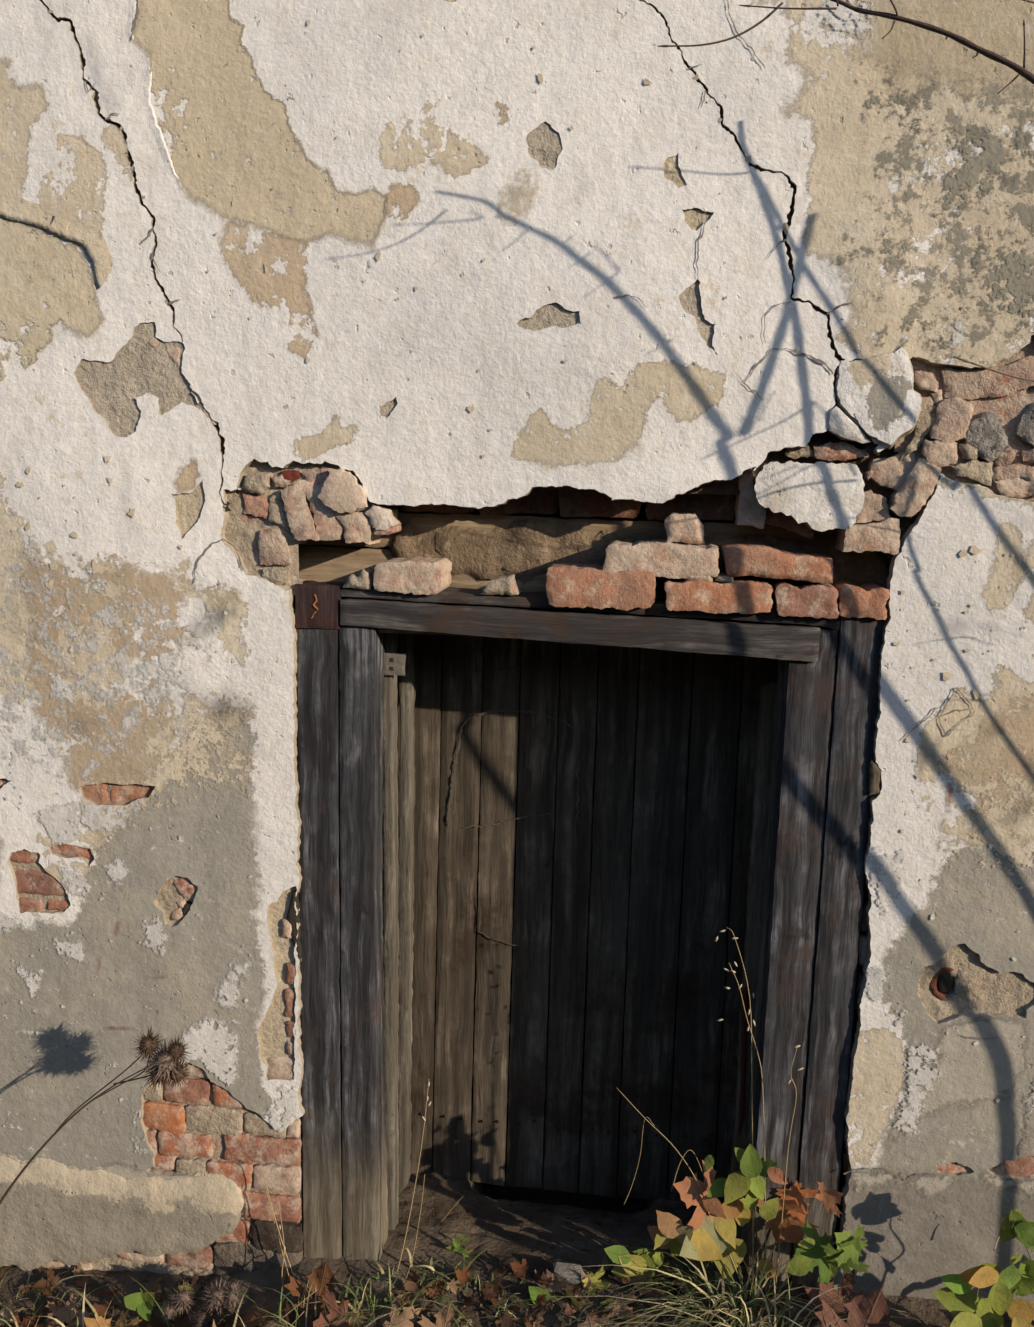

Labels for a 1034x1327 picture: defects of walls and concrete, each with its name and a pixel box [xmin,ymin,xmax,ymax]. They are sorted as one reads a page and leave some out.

peeling [0,58,133,381]
crack [40,0,180,333]
spalling [75,322,217,437]
crack [192,422,244,584]
peeling [125,0,489,363]
spalling [225,415,402,595]
spalling [679,280,717,354]
crack [639,0,878,456]
peeling [733,0,1034,555]
peeling [0,459,257,926]
spalling [259,886,302,1080]
flaking render [42,1063,304,1276]